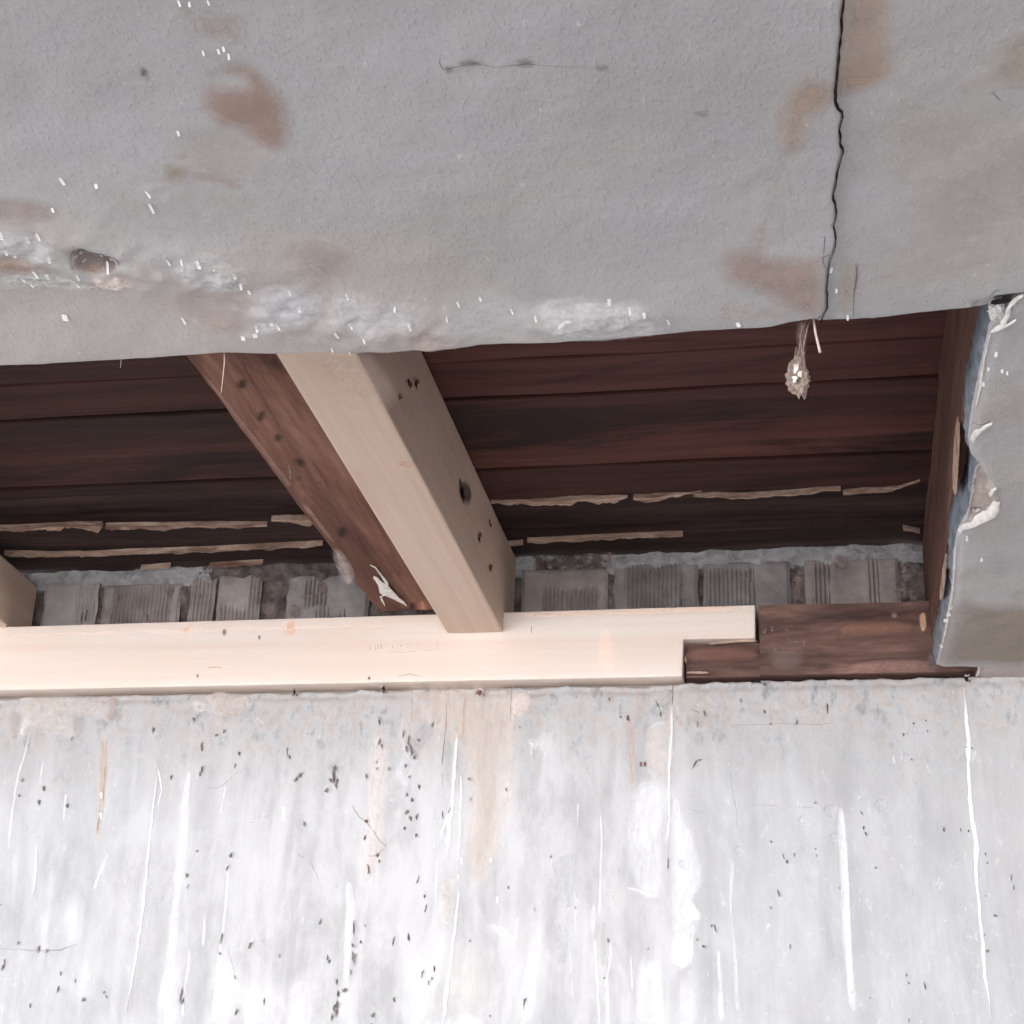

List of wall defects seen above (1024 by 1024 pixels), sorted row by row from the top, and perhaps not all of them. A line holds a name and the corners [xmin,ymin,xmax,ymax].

water stain [214,82,279,144]
crack [815,0,858,323]
spalling [0,249,126,290]
peeling [991,295,1024,333]
spalling [958,467,1000,542]